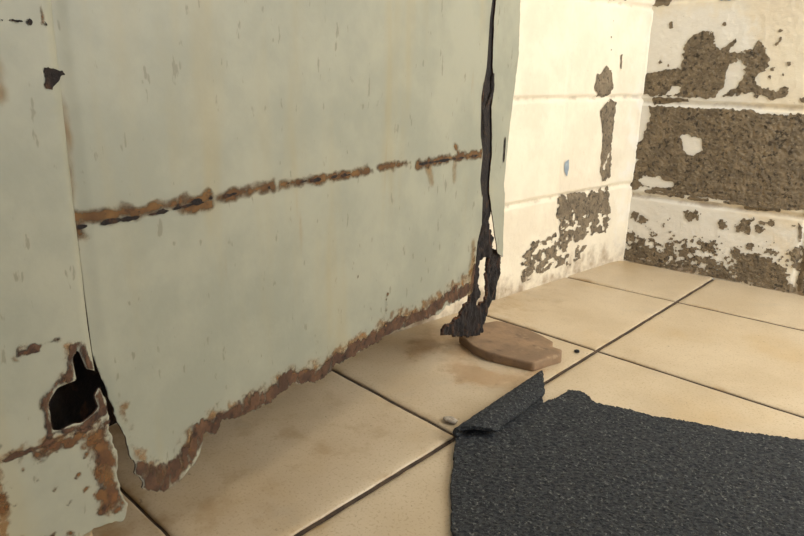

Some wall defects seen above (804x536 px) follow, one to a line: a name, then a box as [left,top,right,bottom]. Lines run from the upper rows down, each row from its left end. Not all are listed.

corrosion [74,144,482,238]
corrosion [483,73,494,137]
peeling [521,54,623,282]
peeling [624,29,804,295]
corrosion [0,493,9,515]
corrosion [17,343,42,357]
corrosion [33,342,125,516]
corrosion [136,247,476,492]